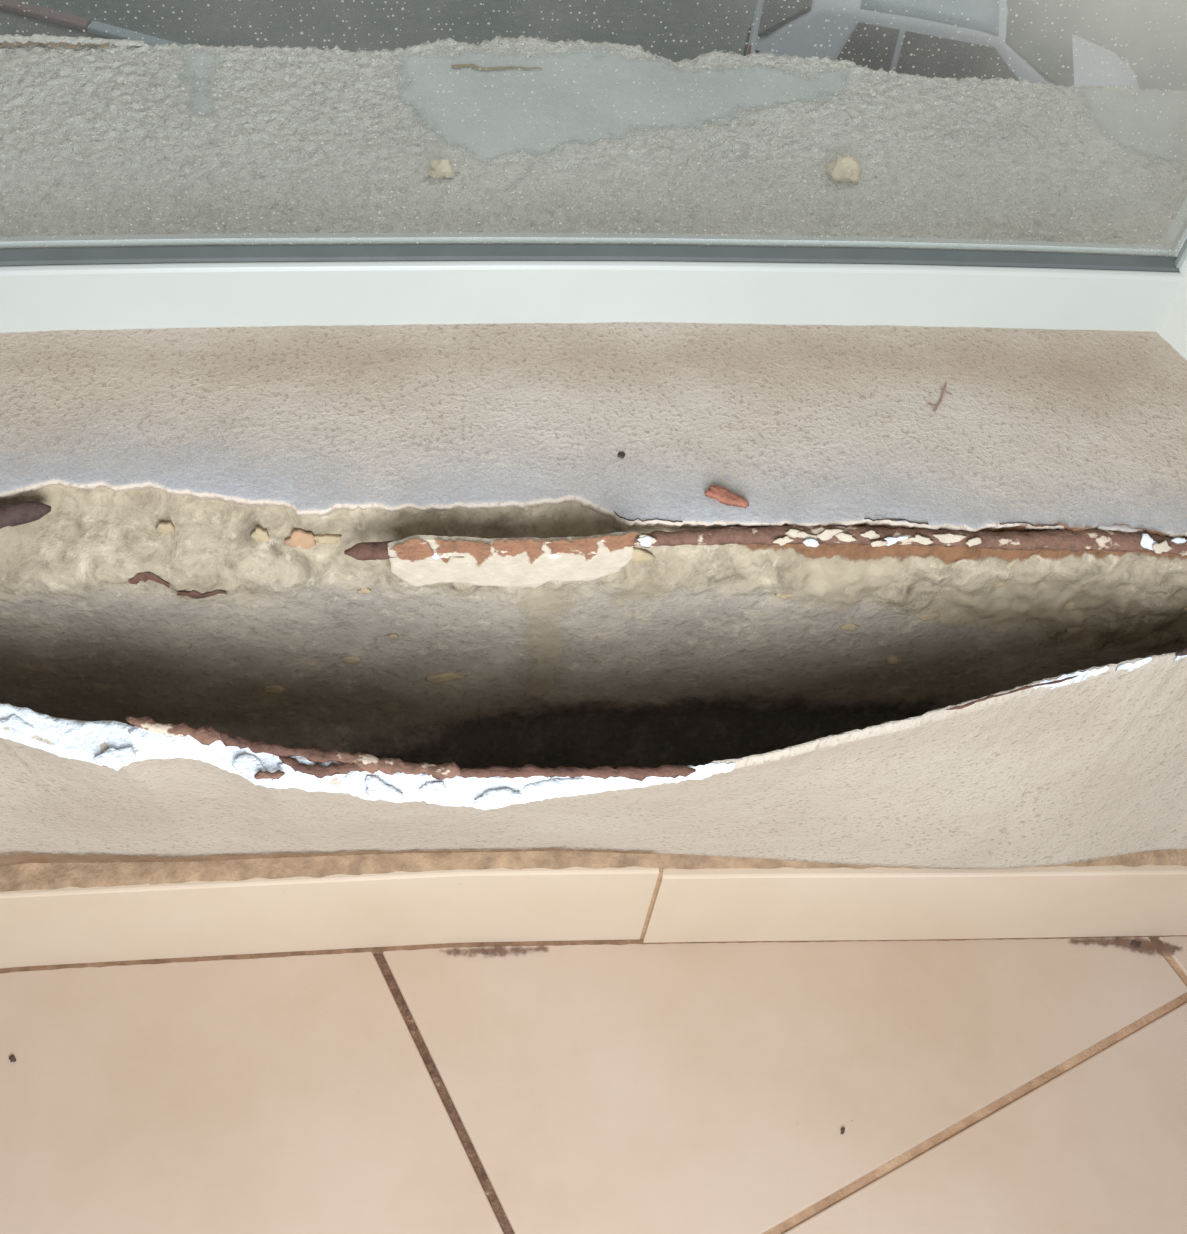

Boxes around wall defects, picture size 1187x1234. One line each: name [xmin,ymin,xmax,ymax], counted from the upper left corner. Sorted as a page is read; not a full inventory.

flaking render [399,49,848,162]
rust [390,511,683,566]
rust [856,518,942,530]
rust [739,522,1187,565]
spalling [0,484,1187,810]
rust [946,675,1079,710]
rust [126,716,696,781]
water stain [362,699,934,774]